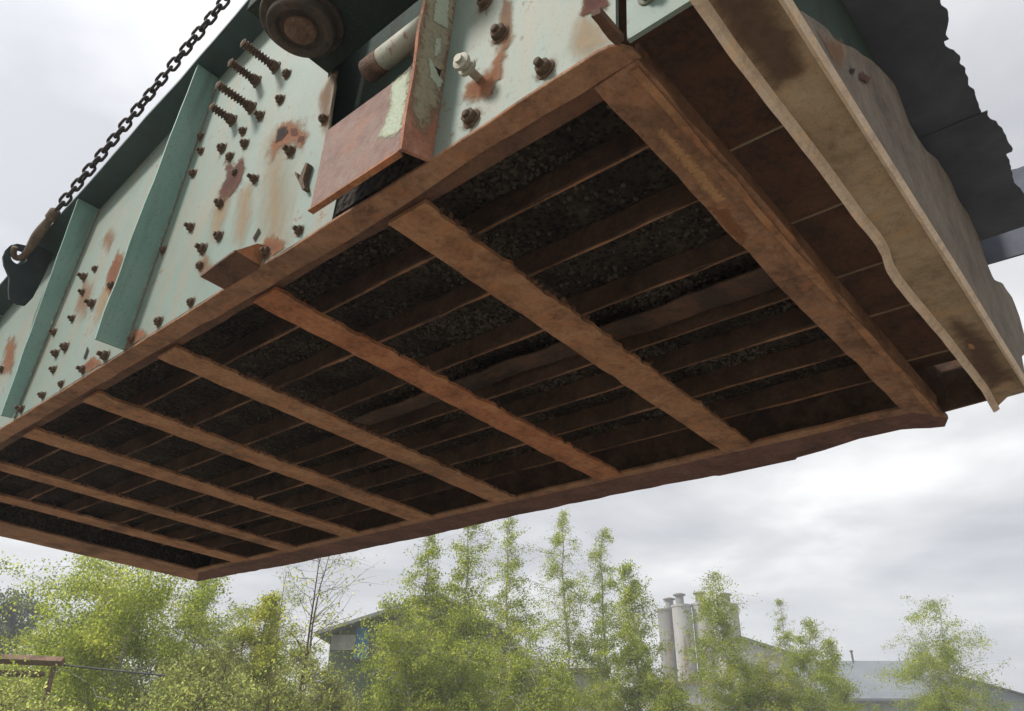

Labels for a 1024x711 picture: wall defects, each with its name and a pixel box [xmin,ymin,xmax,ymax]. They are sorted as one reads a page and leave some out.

peeling [378,0,456,138]
rust [463,0,511,102]
rust [269,121,308,160]
rust [216,157,245,228]
rust [76,234,124,313]